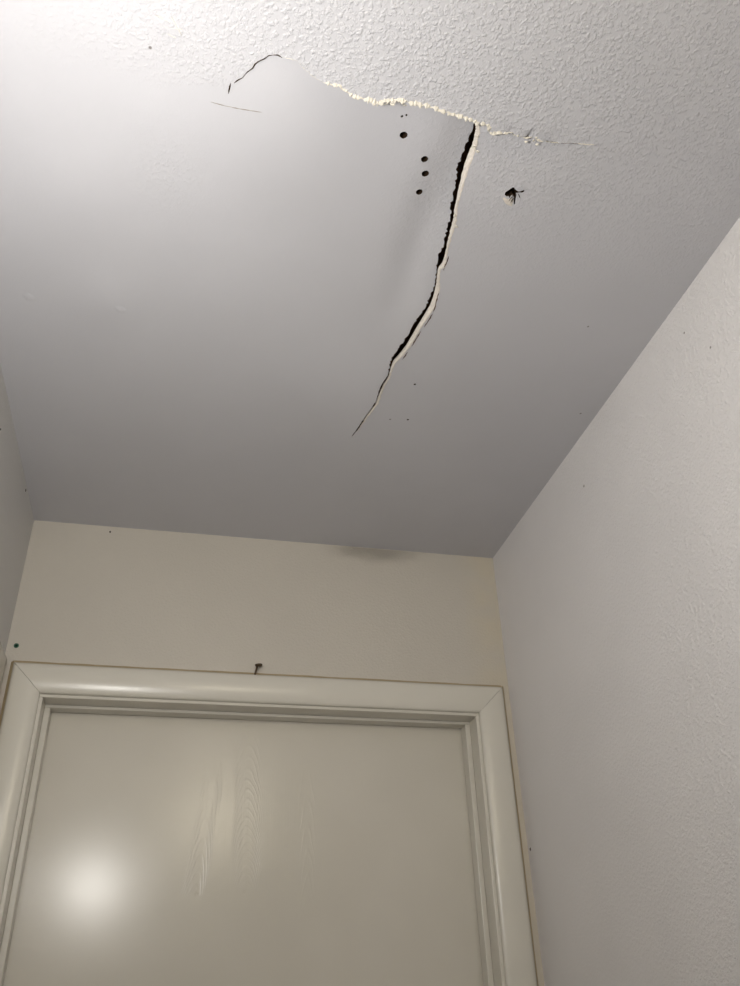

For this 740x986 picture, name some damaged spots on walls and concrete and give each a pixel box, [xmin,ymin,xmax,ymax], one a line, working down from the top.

crack [352,124,480,436]